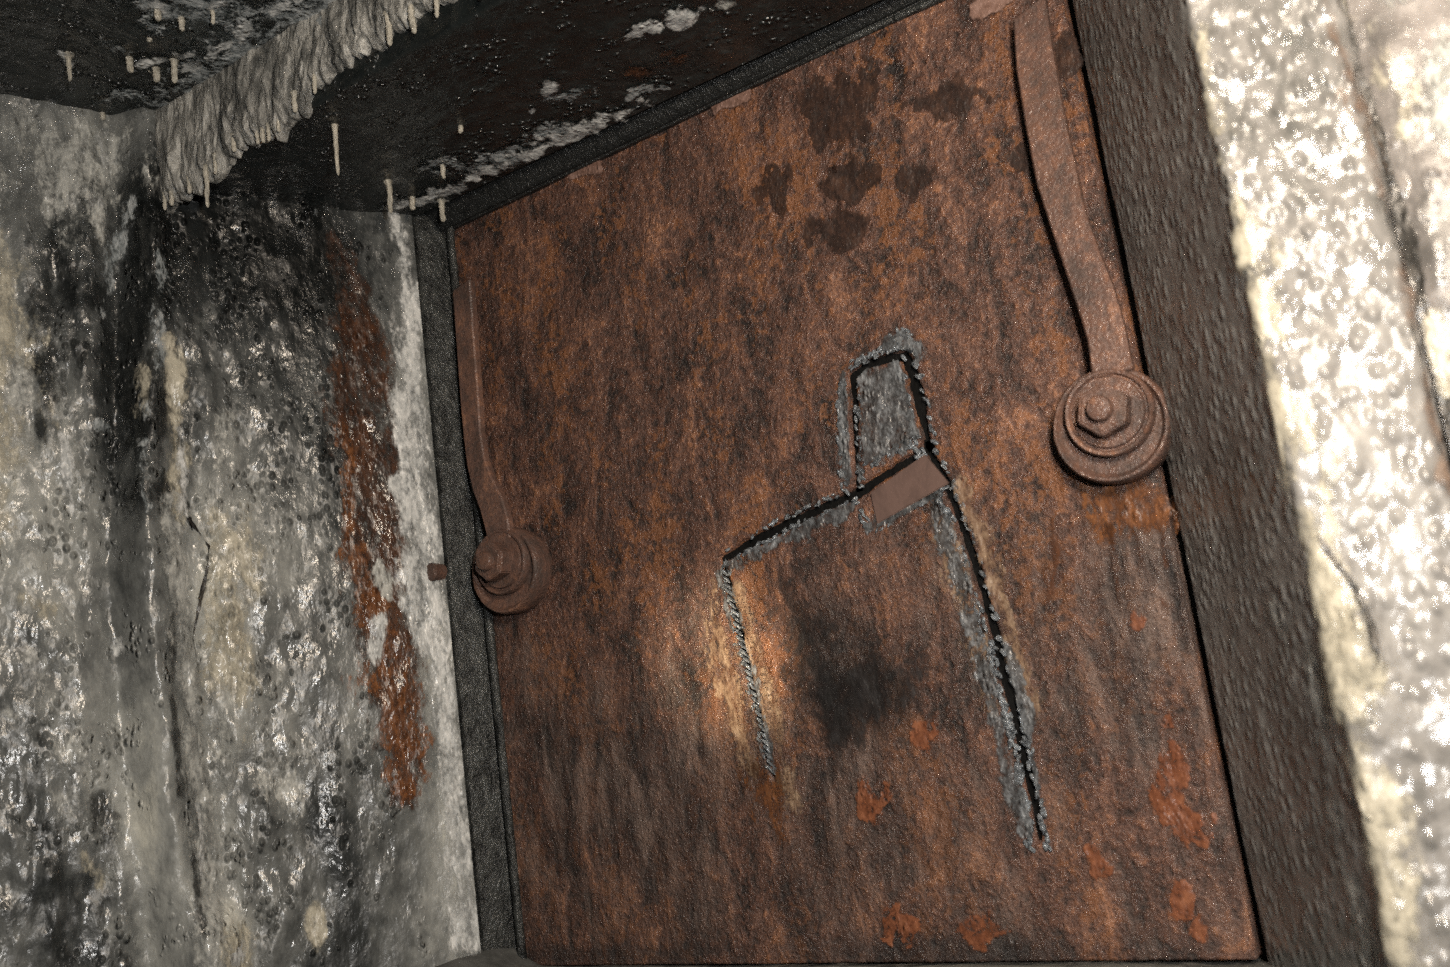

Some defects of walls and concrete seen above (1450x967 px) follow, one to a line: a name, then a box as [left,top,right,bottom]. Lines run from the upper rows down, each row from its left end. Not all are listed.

efflorescence [103,0,335,107]
efflorescence [624,0,734,40]
efflorescence [1374,32,1450,149]
water stain [0,110,236,542]
efflorescence [1423,310,1450,398]
corrosion [323,231,433,809]
corrosion [1060,477,1180,549]
water stain [1231,185,1420,967]
corrosion [855,779,892,824]
corrosion [1148,714,1217,849]
corrosion [881,903,922,949]
corrosion [1169,879,1208,943]